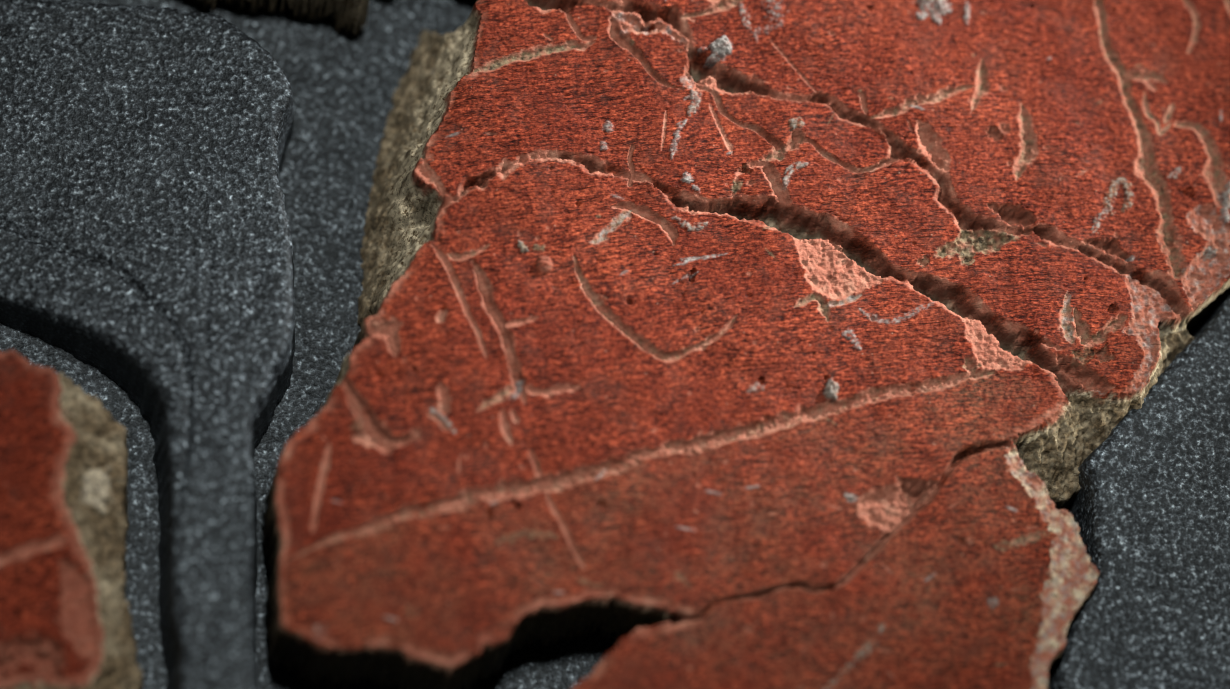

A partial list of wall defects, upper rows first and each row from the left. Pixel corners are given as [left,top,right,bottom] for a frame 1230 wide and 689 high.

spalling [190,0,369,35]
spalling [262,0,673,689]
crack [408,0,1192,405]
spalling [789,234,884,322]
crack [664,436,1014,627]
spalling [970,58,992,113]
spalling [984,101,1041,181]
spalling [1004,186,1230,689]